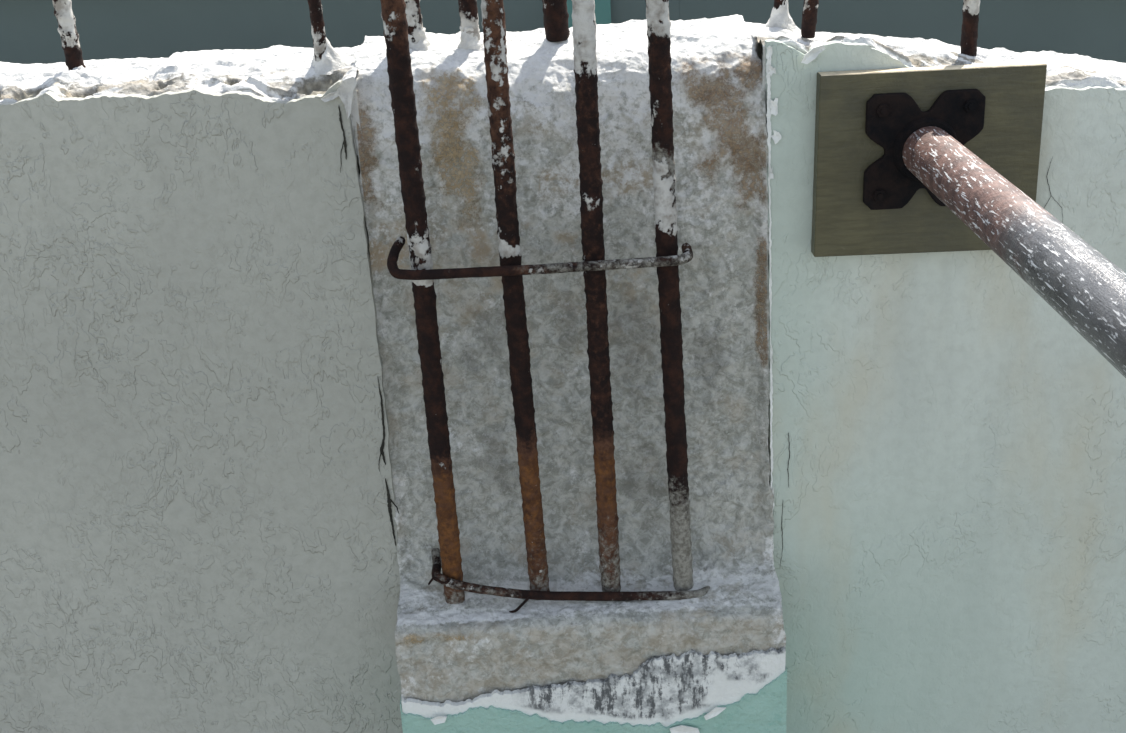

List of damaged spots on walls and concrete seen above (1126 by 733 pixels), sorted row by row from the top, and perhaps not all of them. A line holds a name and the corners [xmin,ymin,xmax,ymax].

spalling [748,0,1126,105]
corrosion [423,72,482,217]
corrosion [682,55,767,207]
spalling [0,0,786,727]
crack [378,379,400,546]
peeling [670,725,700,733]